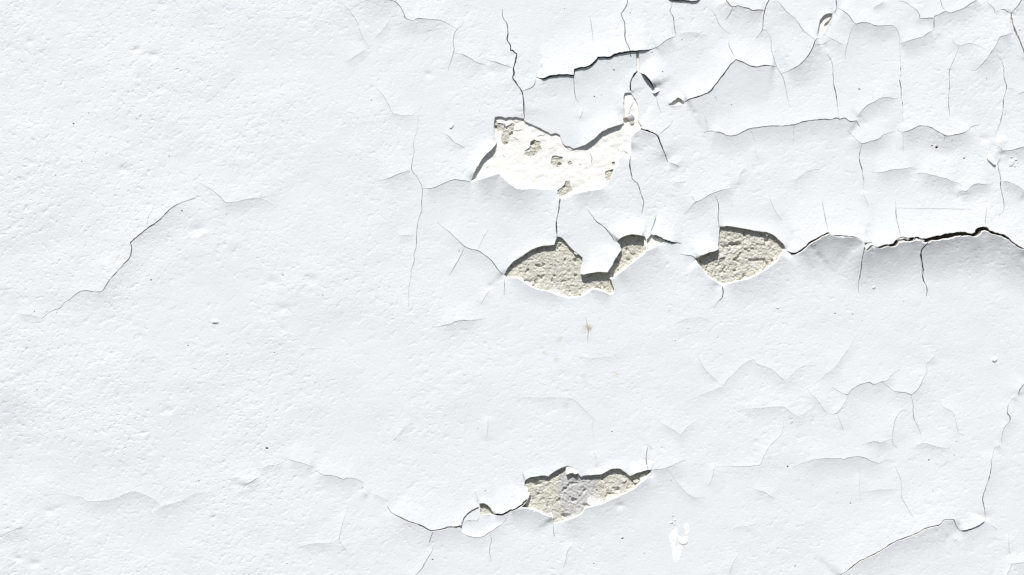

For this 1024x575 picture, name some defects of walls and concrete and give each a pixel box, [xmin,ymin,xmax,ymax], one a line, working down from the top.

peeling [471,91,642,198]
crack [340,0,1024,327]
crack [16,187,275,318]
peeling [503,233,665,298]
peeling [695,226,786,286]
peeling [479,503,496,515]
peeling [518,466,652,524]
crack [646,340,1024,575]